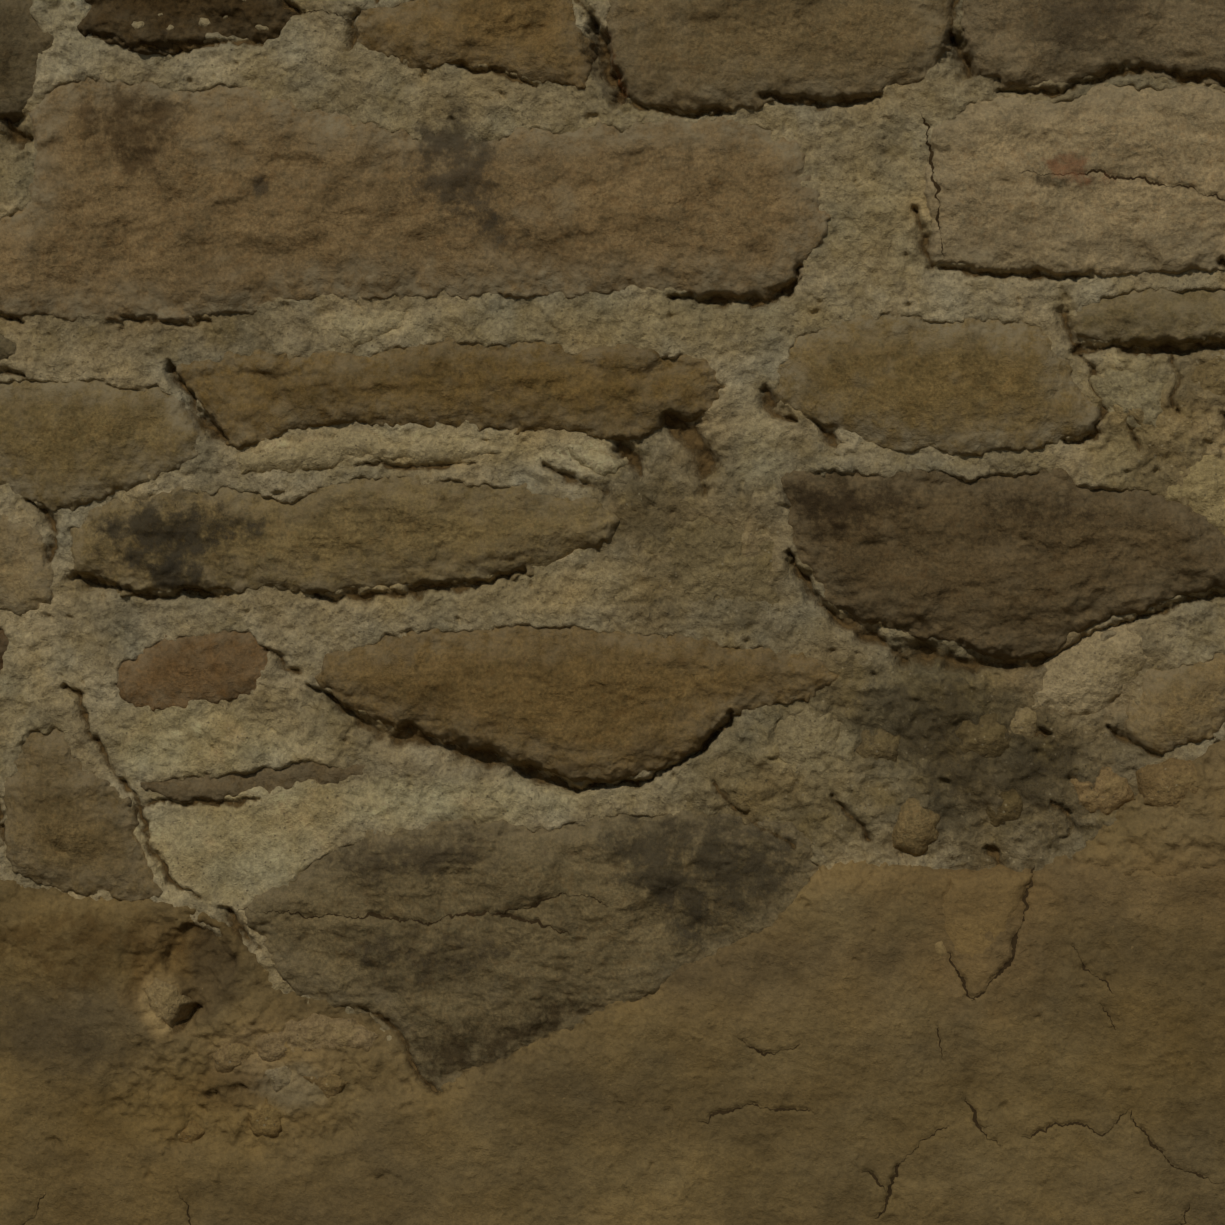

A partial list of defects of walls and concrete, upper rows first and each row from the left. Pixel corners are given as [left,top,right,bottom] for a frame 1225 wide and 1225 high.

crack [921,115,944,256]
crack [1022,169,1225,201]
crack [948,866,1035,1001]
crack [700,1103,814,1123]
crack [861,1098,997,1219]
crack [1027,1110,1212,1225]